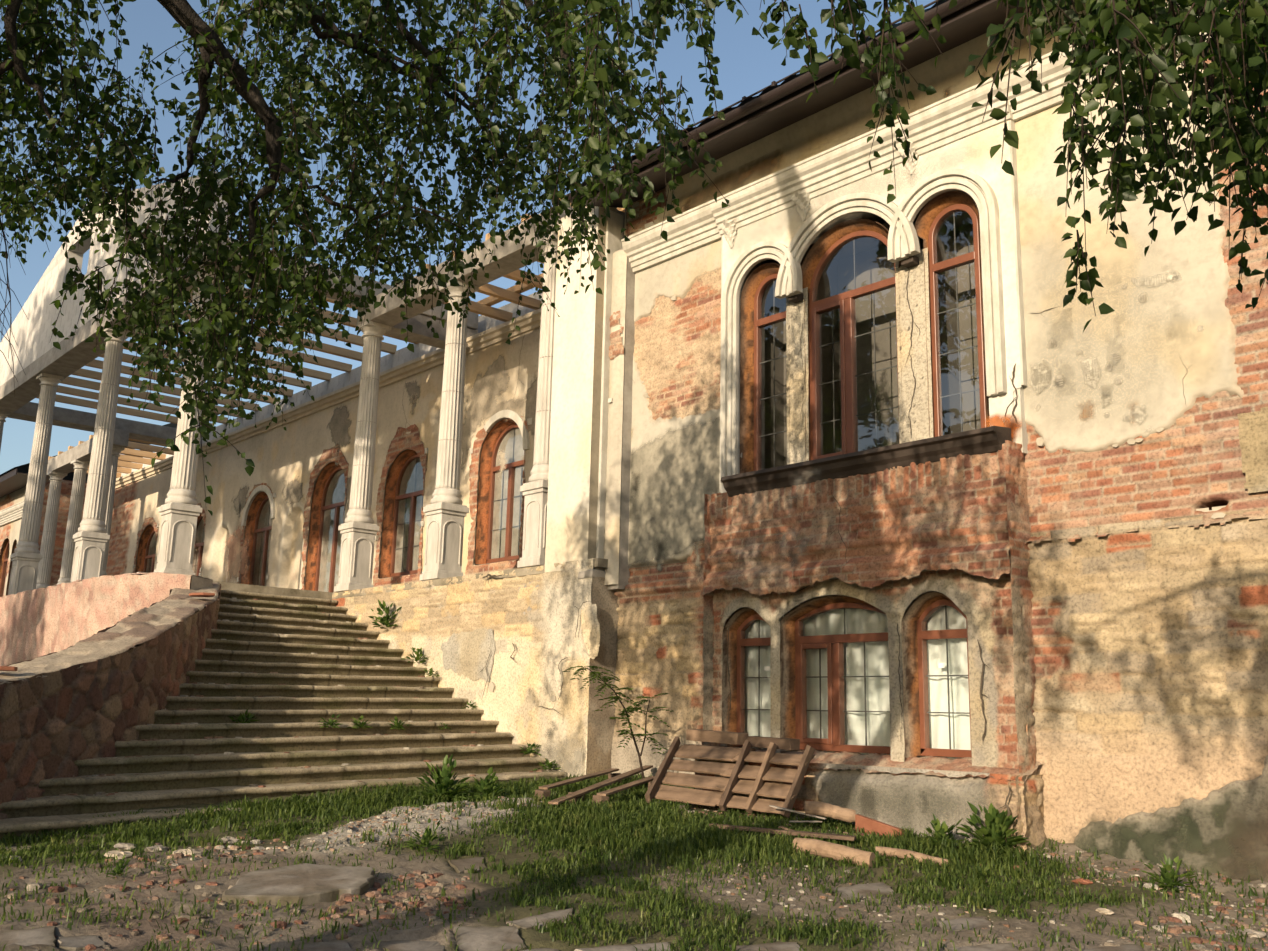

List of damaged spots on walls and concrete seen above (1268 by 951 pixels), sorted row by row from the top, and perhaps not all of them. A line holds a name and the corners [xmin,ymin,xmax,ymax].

flaking render [609,137,1268,843]
spalling [544,655,563,702]
spalling [580,603,600,659]
crack [977,639,991,740]